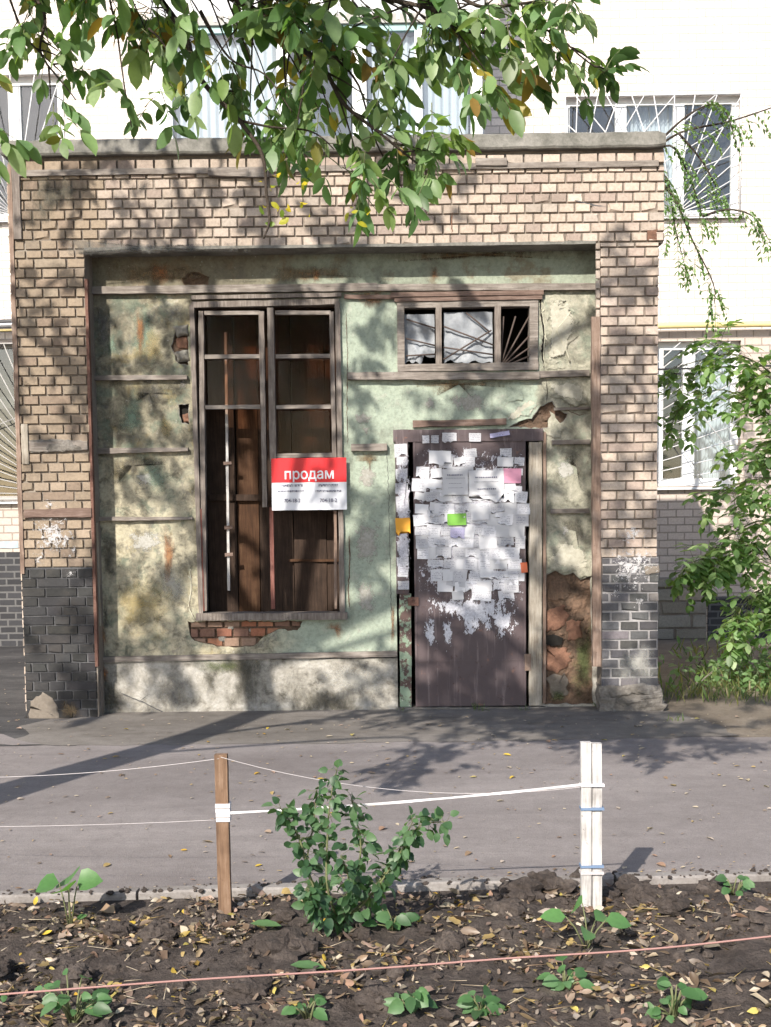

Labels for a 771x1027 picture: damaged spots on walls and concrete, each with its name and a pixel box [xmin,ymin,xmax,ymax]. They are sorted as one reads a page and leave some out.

spalling [171,324,190,366]
peeling [549,299,574,363]
spalling [178,404,189,425]
peeling [504,380,587,438]
spalling [185,620,302,654]
spalling [544,541,660,705]
damp [104,679,118,708]
damp [236,660,260,698]
damp [305,692,352,710]